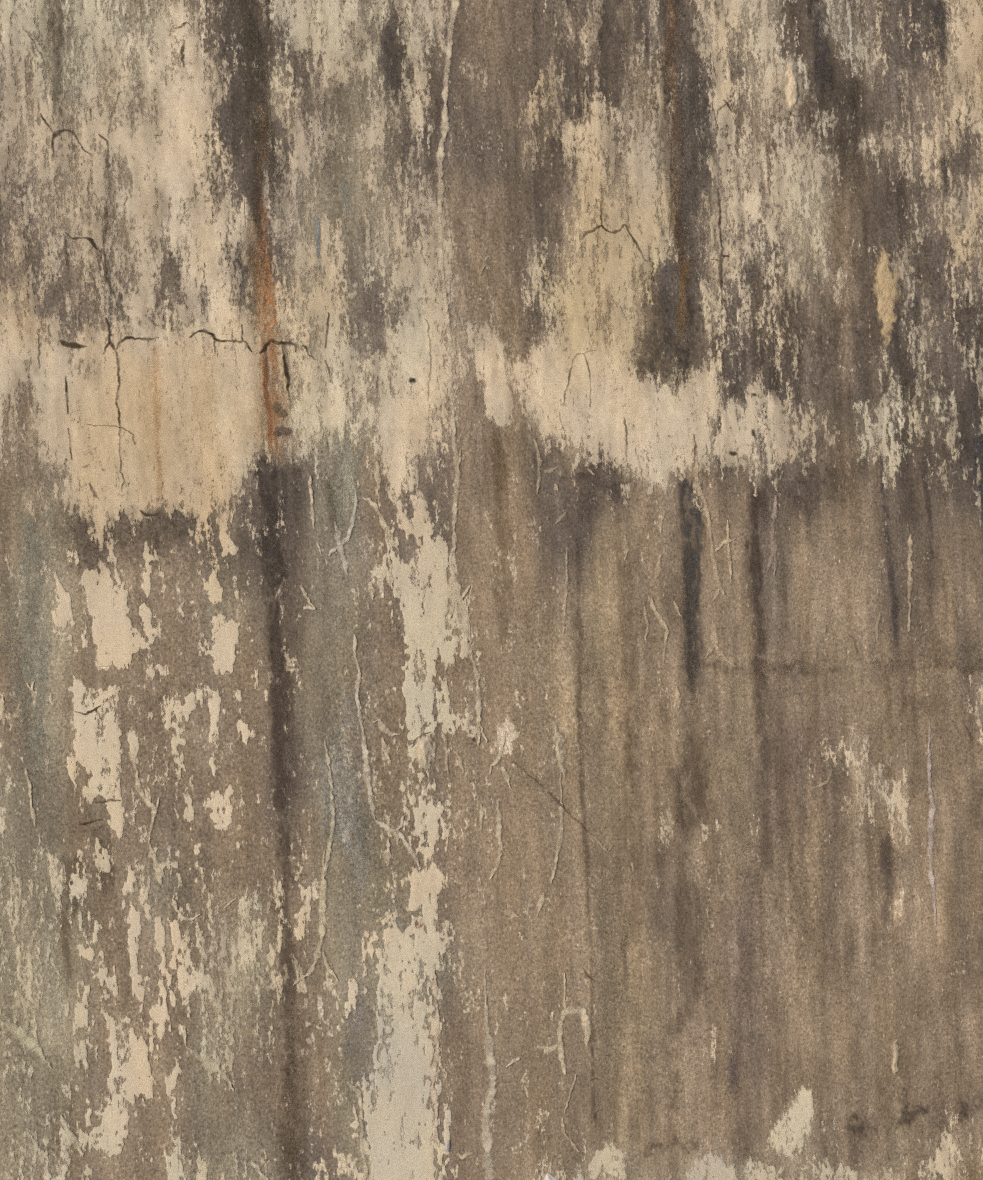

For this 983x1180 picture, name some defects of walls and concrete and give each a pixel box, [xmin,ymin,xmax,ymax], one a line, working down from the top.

crack [583,203,647,261]
crack [37,92,160,521]
crack [189,313,332,397]
corrosion [256,217,278,445]
peeling [240,511,286,536]
peeling [41,560,76,647]
peeling [141,542,164,598]
peeling [198,612,242,675]
water stain [254,459,290,908]
water stain [680,479,702,684]
peeling [0,675,314,1180]
peeling [533,1137,628,1180]